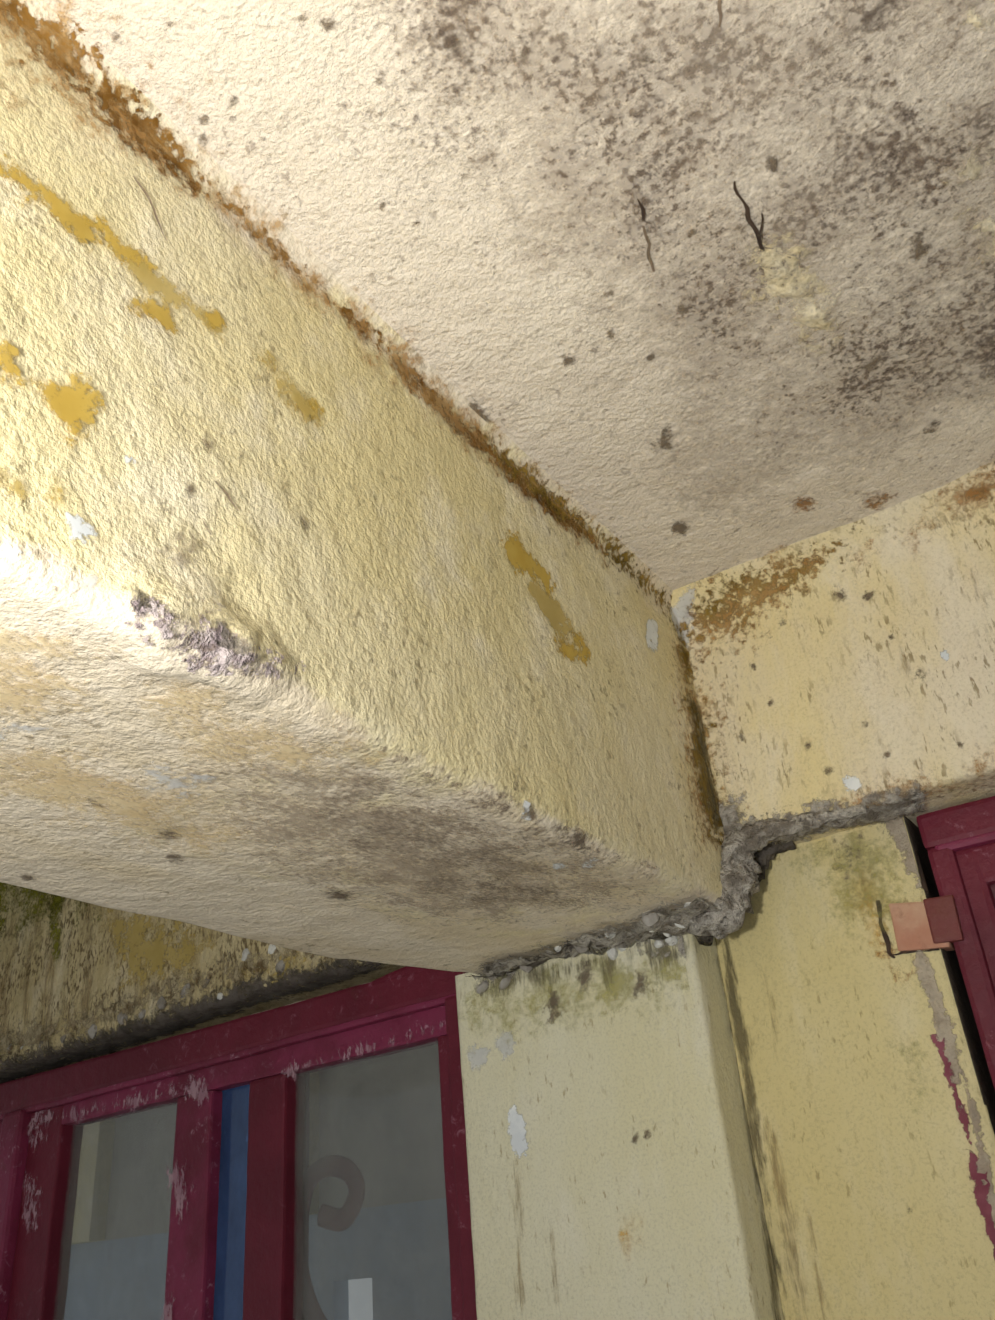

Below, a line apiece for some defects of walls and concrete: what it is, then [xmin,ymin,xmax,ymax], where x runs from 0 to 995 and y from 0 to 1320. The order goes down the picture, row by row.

water stain [409,0,476,73]
peeling [0,151,227,335]
rust [0,0,635,562]
crack [733,181,765,252]
water stain [766,157,777,172]
water stain [833,103,962,205]
peeling [0,341,106,446]
peeling [501,530,591,666]
water stain [604,542,860,845]
spalling [466,776,929,996]
water stain [716,937,781,1320]
spalling [913,950,995,1228]